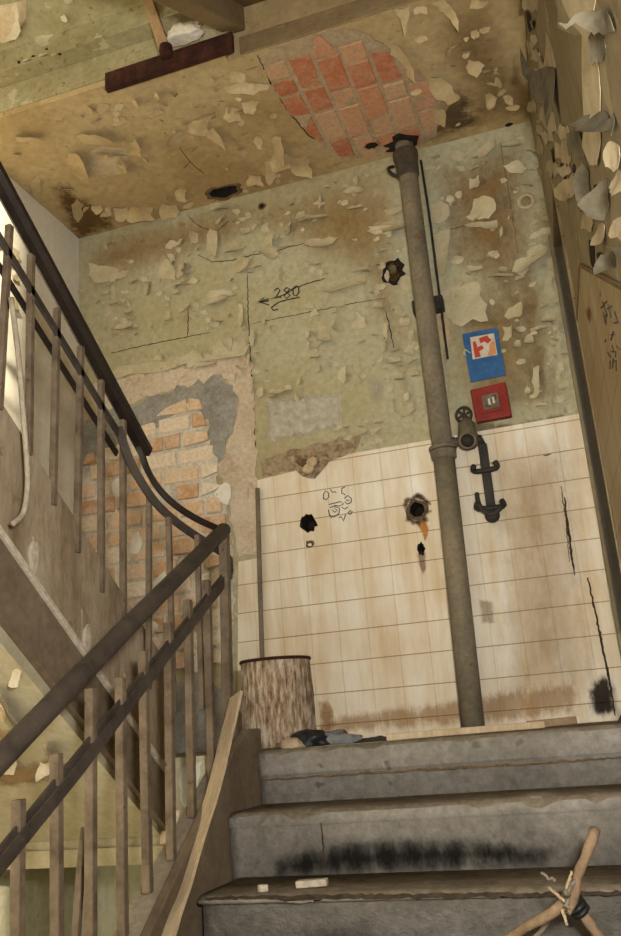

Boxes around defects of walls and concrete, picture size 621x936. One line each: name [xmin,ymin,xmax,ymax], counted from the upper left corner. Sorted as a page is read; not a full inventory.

peeling [17,34,61,64]
flaking render [62,0,621,652]
crack [561,487,616,716]
flaking render [176,595,221,673]
peeling [8,668,22,688]
leakage [590,678,613,714]
peeling [0,699,16,740]
peeling [35,744,52,782]
leakage [277,842,545,874]